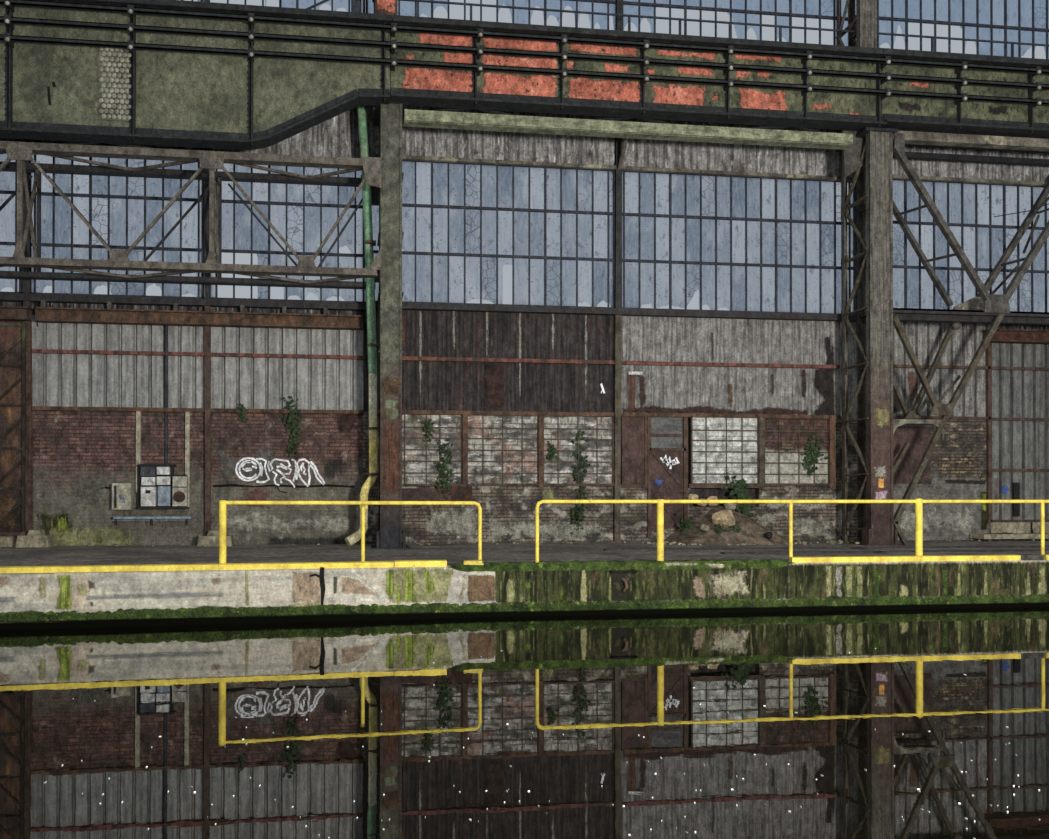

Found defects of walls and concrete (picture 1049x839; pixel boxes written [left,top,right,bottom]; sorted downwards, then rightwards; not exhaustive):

peeling [403,33,720,106]
peeling [735,54,788,110]
leakage [0,563,1049,630]